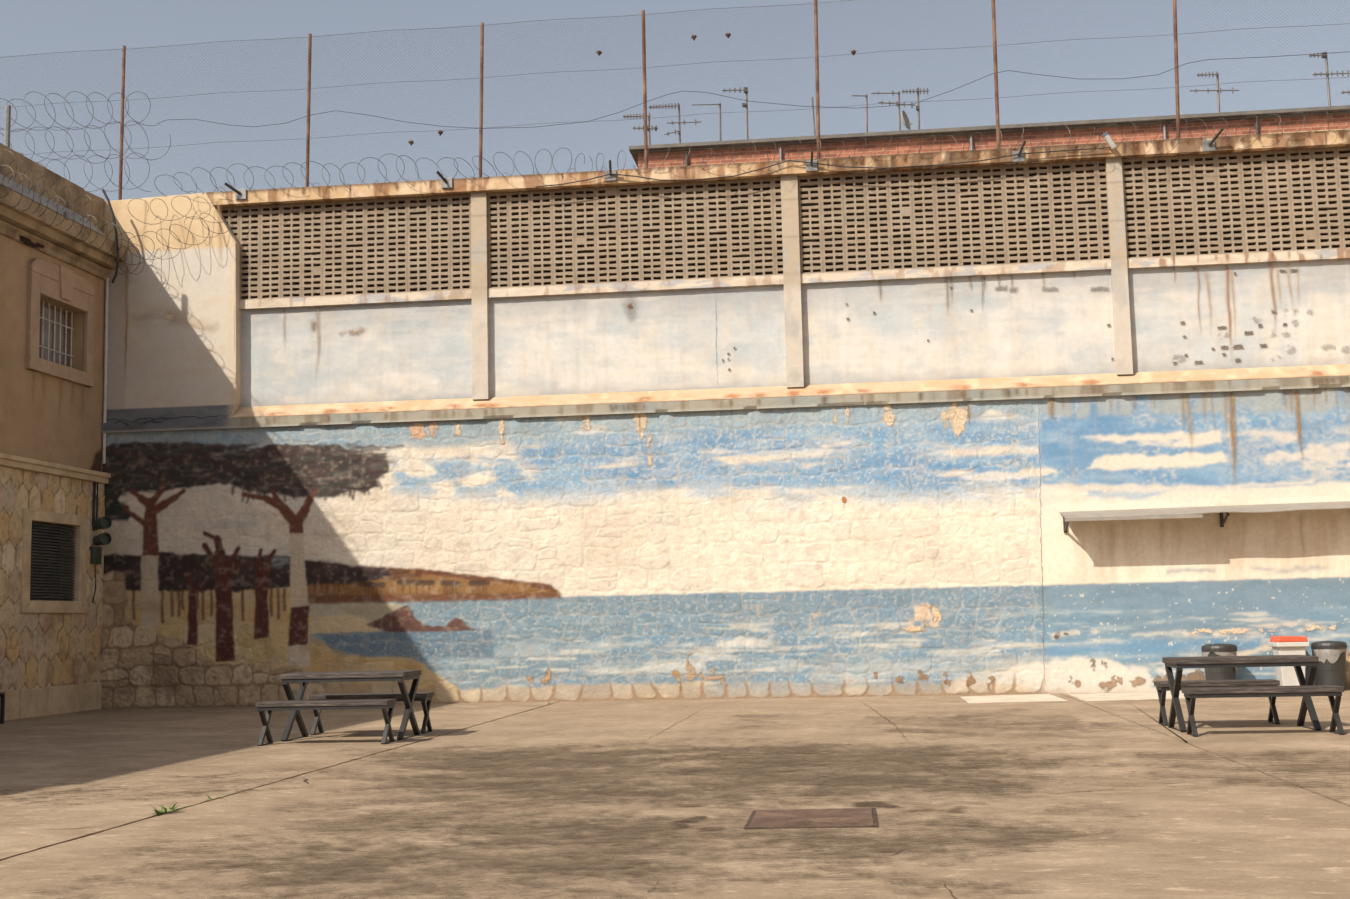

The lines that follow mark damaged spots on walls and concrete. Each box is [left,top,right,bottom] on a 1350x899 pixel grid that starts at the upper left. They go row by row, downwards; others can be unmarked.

spalling [1174,309,1312,364]
peeling [941,402,969,437]
corrosion [1290,391,1301,446]
flaking render [100,597,1033,709]
spalling [1090,658,1206,691]